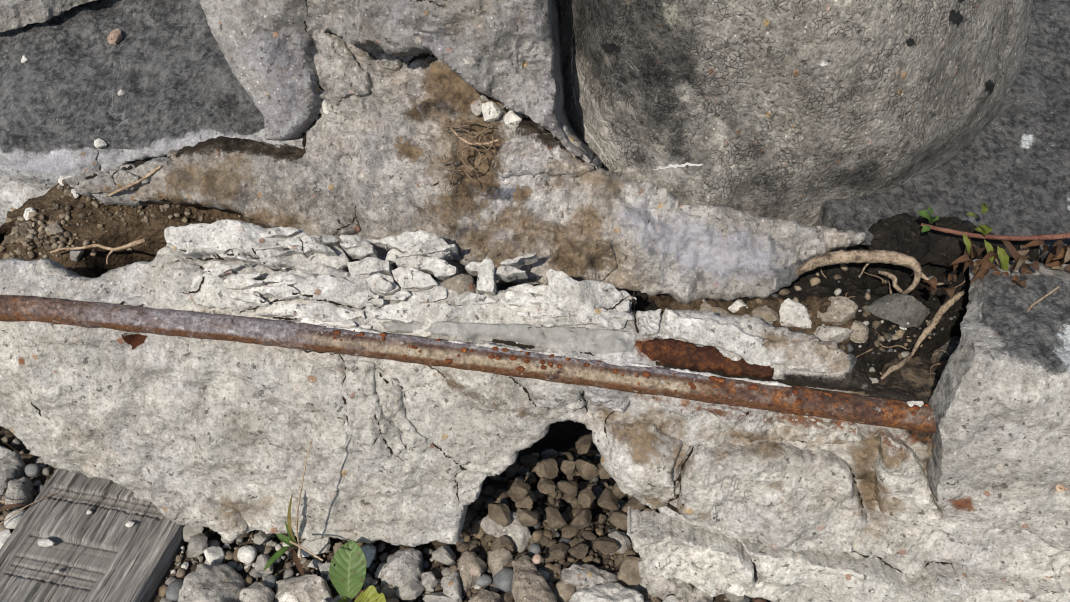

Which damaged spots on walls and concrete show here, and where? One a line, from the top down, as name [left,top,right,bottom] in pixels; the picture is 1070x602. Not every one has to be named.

spalling [94,138,107,149]
spalling [482,101,594,178]
spalling [58,169,142,199]
spalling [96,296,147,306]
spalling [164,213,857,374]
corrosion [0,295,936,453]
spalling [341,359,427,458]
crack [433,443,466,505]
spalling [458,469,490,494]
spalling [151,490,248,542]
crack [852,542,965,588]